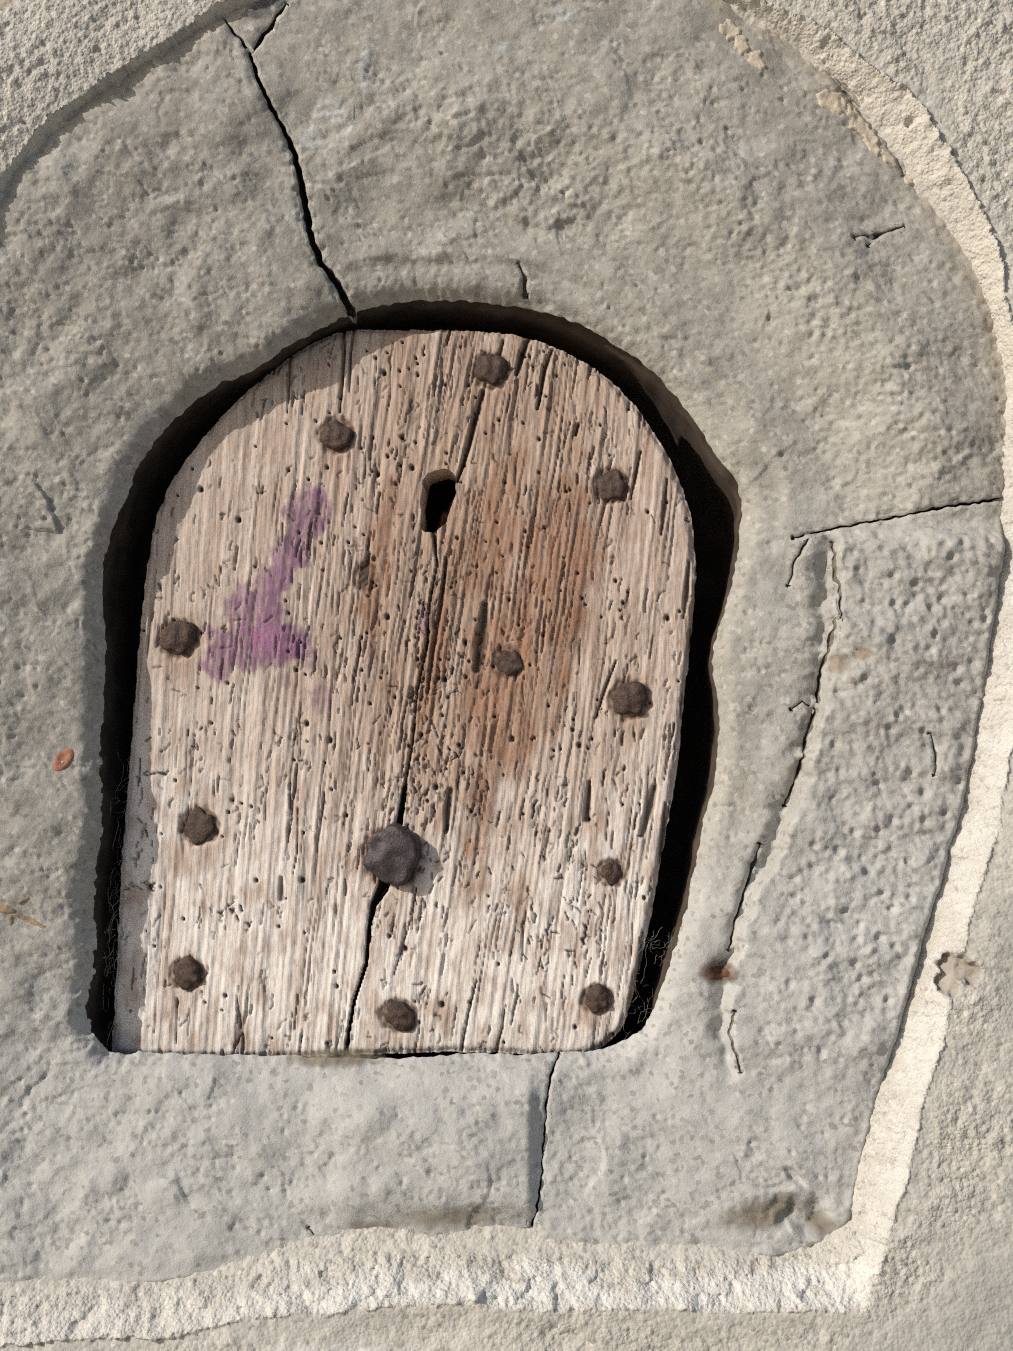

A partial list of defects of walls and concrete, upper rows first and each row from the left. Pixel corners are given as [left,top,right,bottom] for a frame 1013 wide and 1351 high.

crack [219,3,356,316]
crack [780,493,1003,807]
crack [724,843,764,950]
crack [722,1011,745,1072]
crack [524,1052,563,1230]